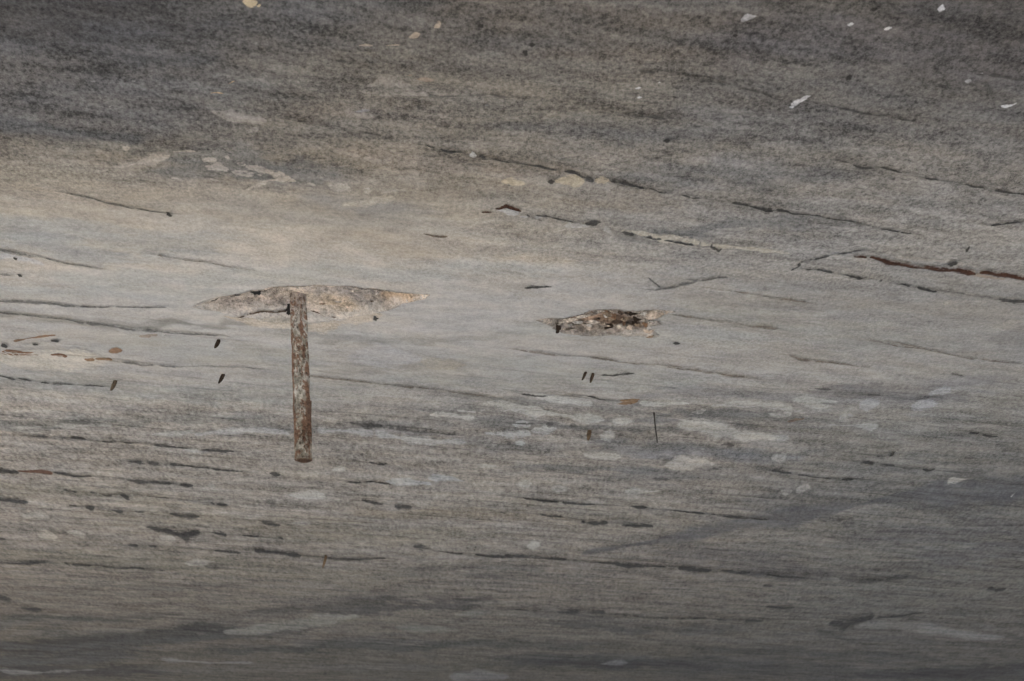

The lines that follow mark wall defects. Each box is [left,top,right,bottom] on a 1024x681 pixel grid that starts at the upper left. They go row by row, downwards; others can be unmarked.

spalling [192,285,430,323]
spalling [536,309,675,338]